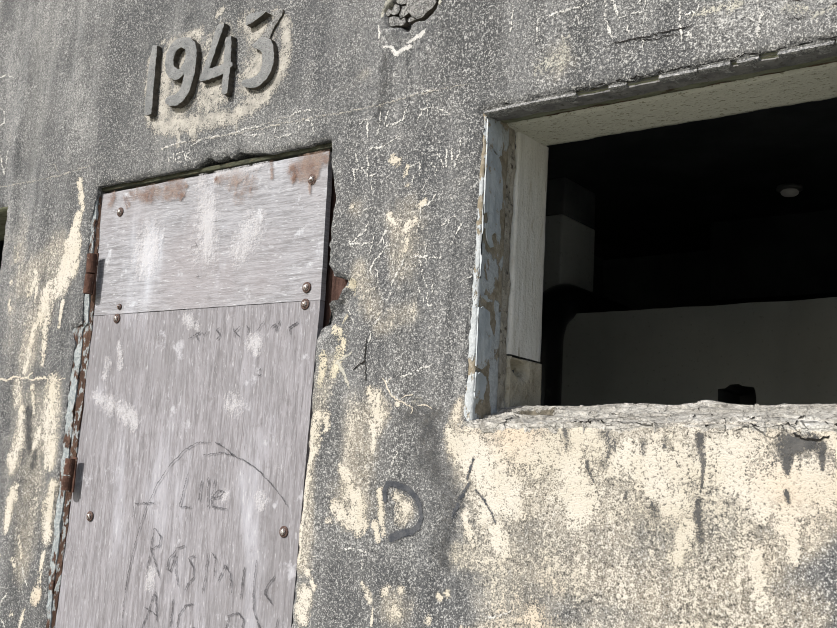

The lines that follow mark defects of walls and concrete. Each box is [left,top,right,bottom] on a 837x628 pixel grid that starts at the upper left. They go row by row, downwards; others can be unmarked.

corrosion [289,152,329,194]
leakage [25,405,38,471]
leakage [599,430,616,469]
crack [574,406,837,441]
leakage [774,432,828,475]
leakage [693,432,707,545]